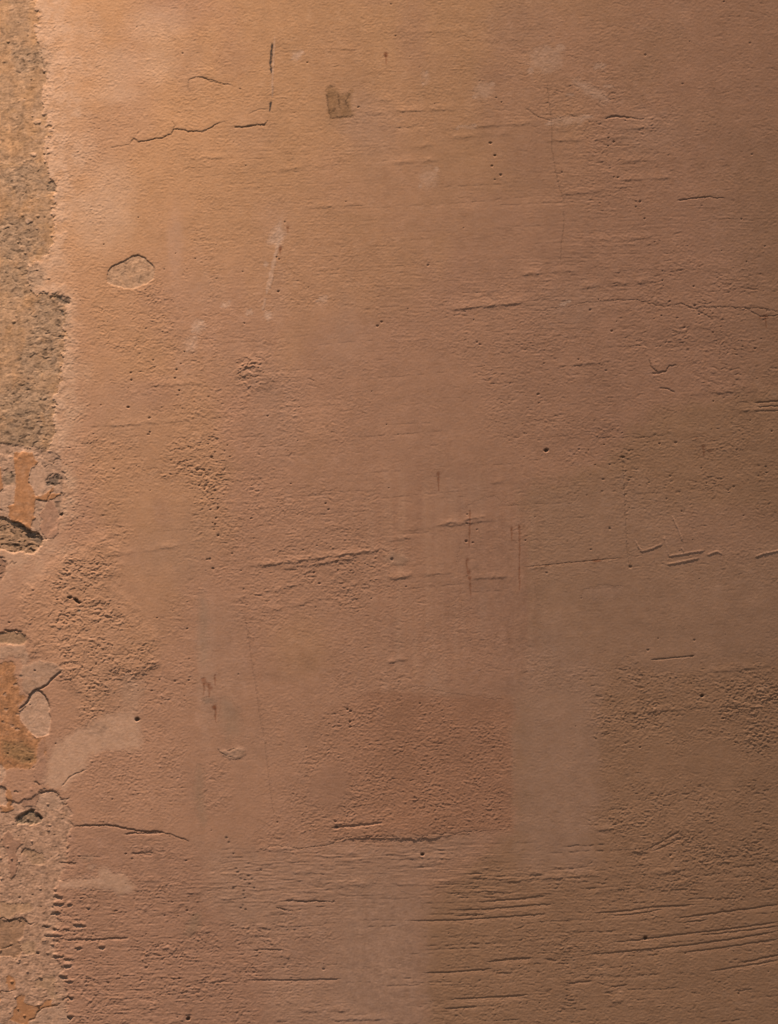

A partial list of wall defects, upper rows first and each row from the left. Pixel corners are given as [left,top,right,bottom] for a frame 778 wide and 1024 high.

crack [187,77,233,92]
crack [110,108,268,149]
flaking render [0,0,73,584]
crack [19,670,63,710]
flaking render [0,661,128,1024]
crack [73,824,190,843]